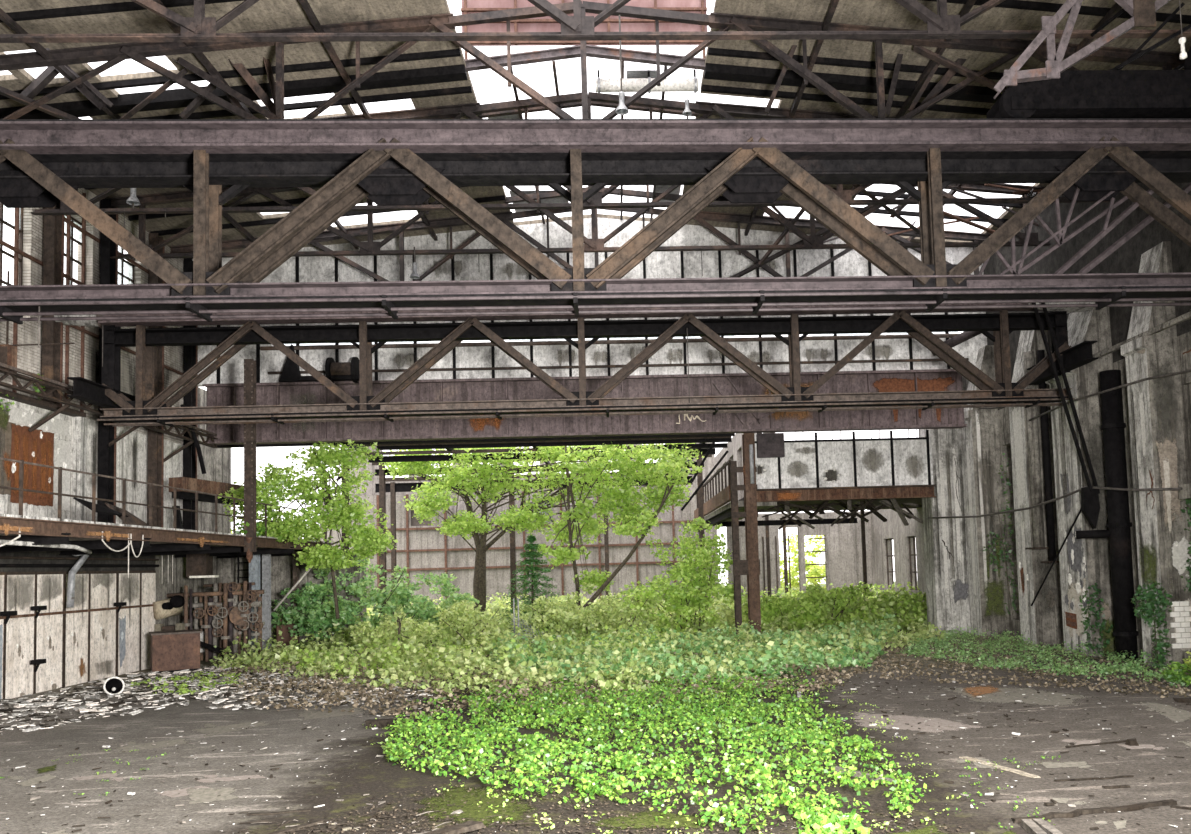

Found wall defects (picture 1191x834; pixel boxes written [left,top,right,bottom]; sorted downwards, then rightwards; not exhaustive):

rust [873,377,955,422]
rust [470,414,500,431]
rust [3,423,54,507]
leakage [788,448,815,477]
leakage [862,449,883,472]
leakage [906,410,1001,606]
spalling [1155,437,1191,577]
leakage [8,574,138,619]
spalling [1169,599,1191,651]